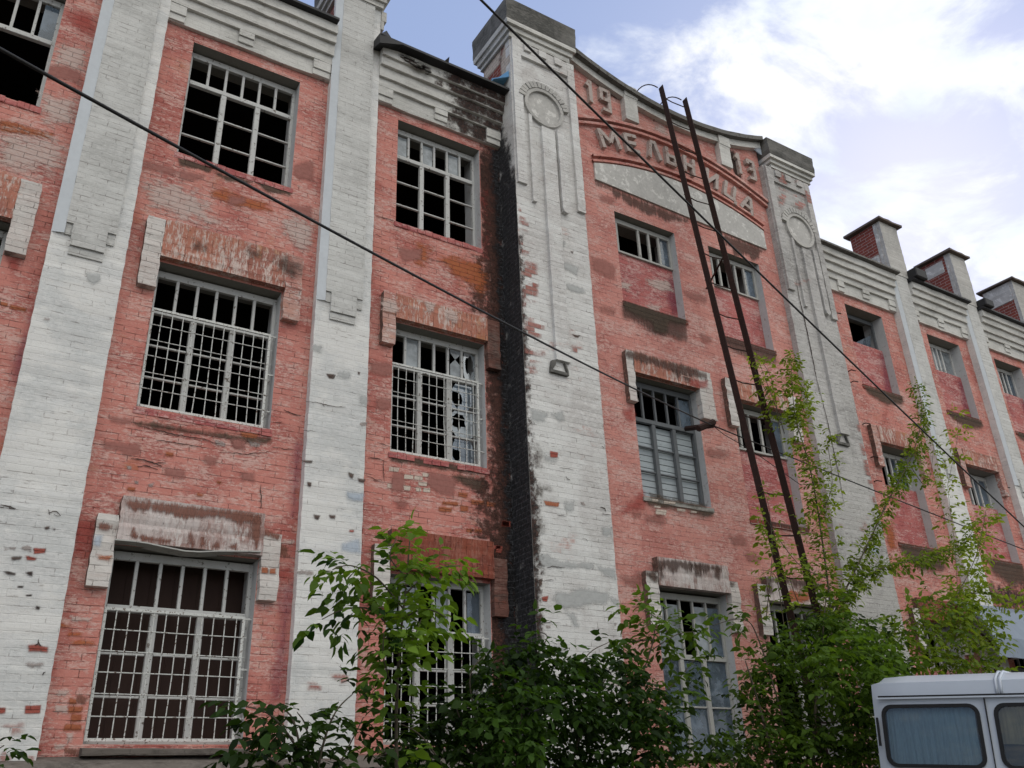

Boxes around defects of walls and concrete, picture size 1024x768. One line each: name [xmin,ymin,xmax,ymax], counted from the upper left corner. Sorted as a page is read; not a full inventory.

peeling [521,242,537,305]
water stain [382,298,400,313]
peeling [526,318,543,337]
water stain [625,350,707,388]
water stain [391,72,544,742]
peeling [5,545,46,609]
water stain [644,559,734,585]
spalling [26,644,48,668]
flaking render [25,705,41,713]